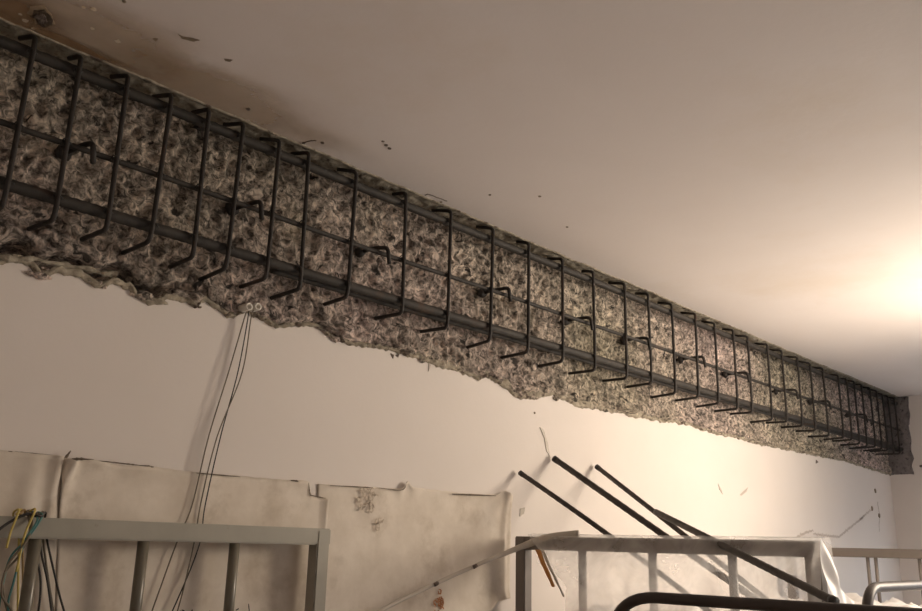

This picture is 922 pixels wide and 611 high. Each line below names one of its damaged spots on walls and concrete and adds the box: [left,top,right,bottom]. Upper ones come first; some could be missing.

spalling [0,4,922,476]